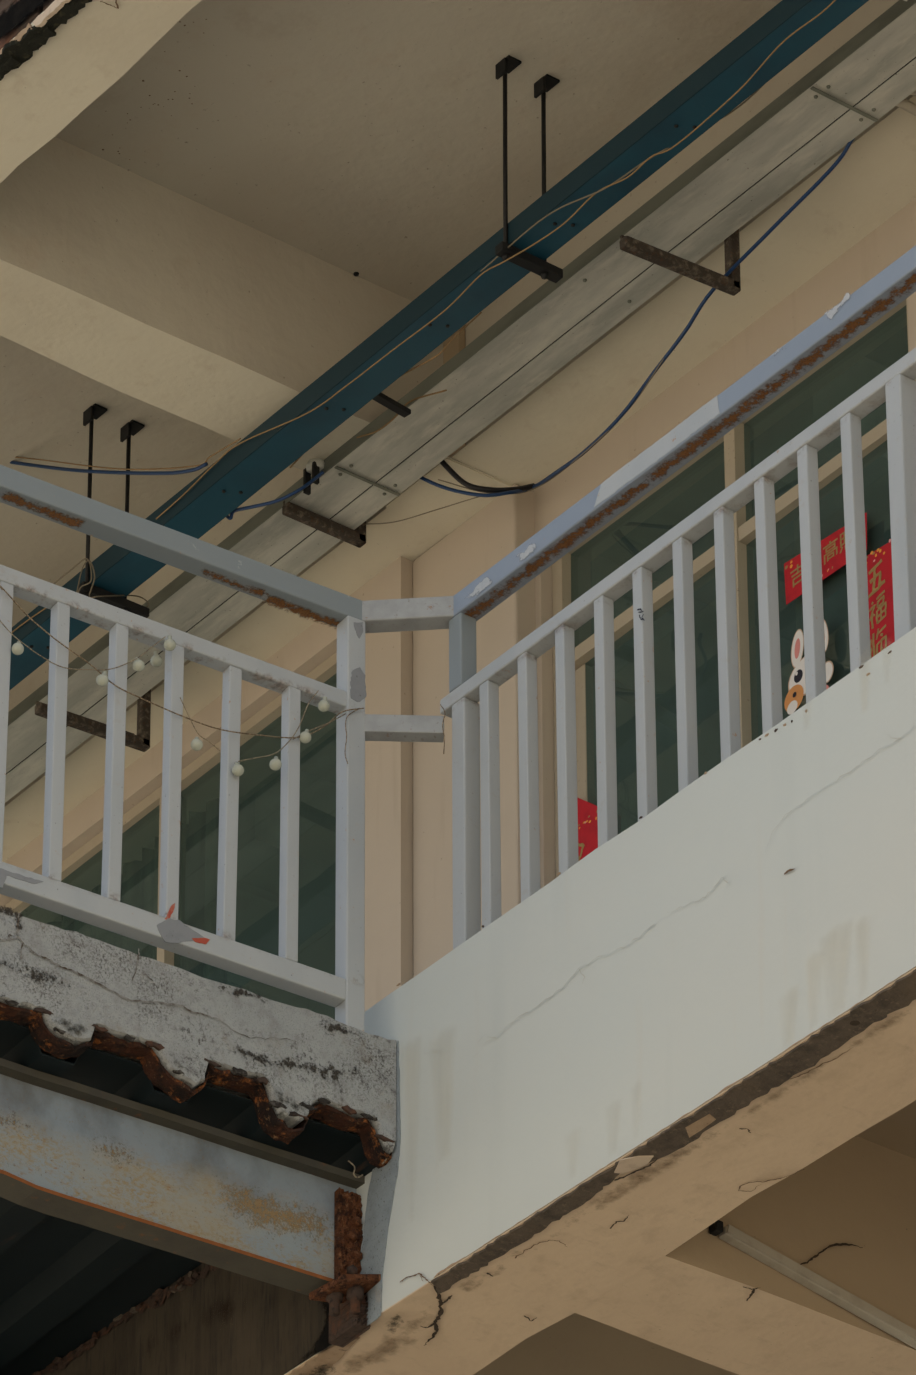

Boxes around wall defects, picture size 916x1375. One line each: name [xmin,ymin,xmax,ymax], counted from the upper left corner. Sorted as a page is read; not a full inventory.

rust [465,273,916,618]
crack [0,911,297,1042]
spalling [5,1000,66,1034]
spalling [123,1034,165,1051]
rust [0,1002,392,1169]
flaking render [204,1041,401,1375]
crack [486,1240,567,1276]
crack [800,1243,863,1265]
crack [400,1273,452,1345]